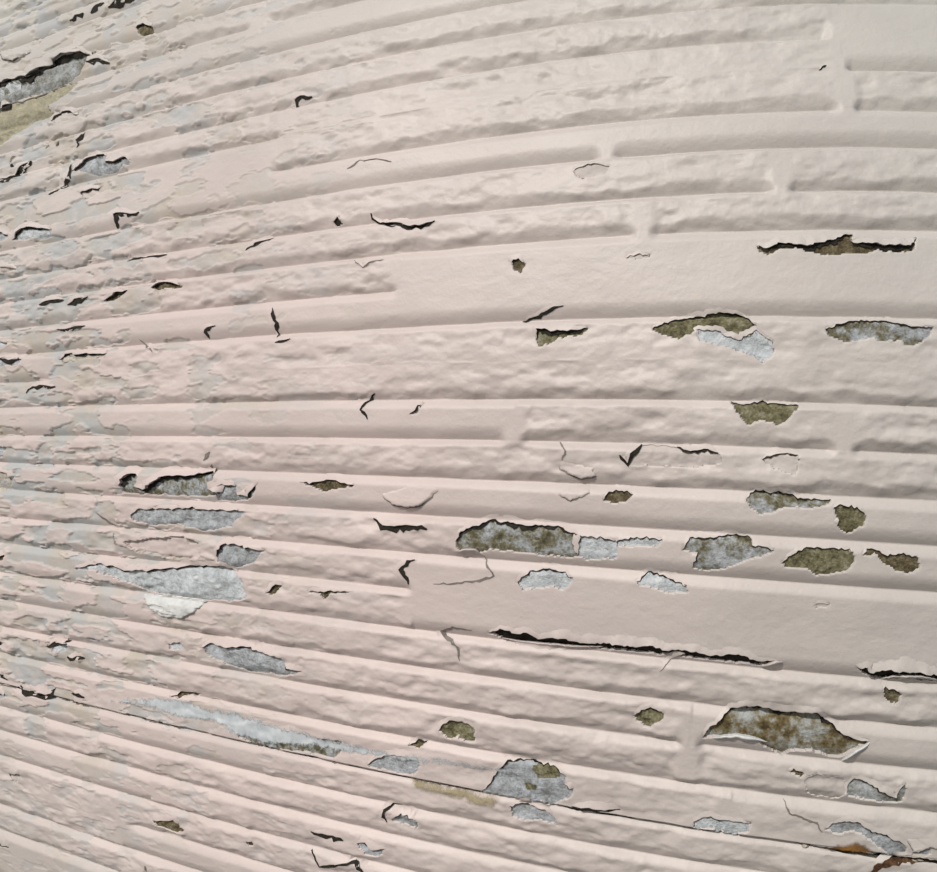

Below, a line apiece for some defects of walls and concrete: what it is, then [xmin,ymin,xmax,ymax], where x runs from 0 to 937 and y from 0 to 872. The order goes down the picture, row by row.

peeling [0,45,110,145]
peeling [757,232,917,255]
peeling [651,308,773,363]
peeling [826,316,933,345]
peeling [730,397,799,425]
peeling [746,487,866,533]
peeling [73,465,264,619]
peeling [454,514,662,589]
peeling [781,540,919,575]
peeling [702,700,870,761]
peeling [481,753,620,824]
crack [869,852,937,872]